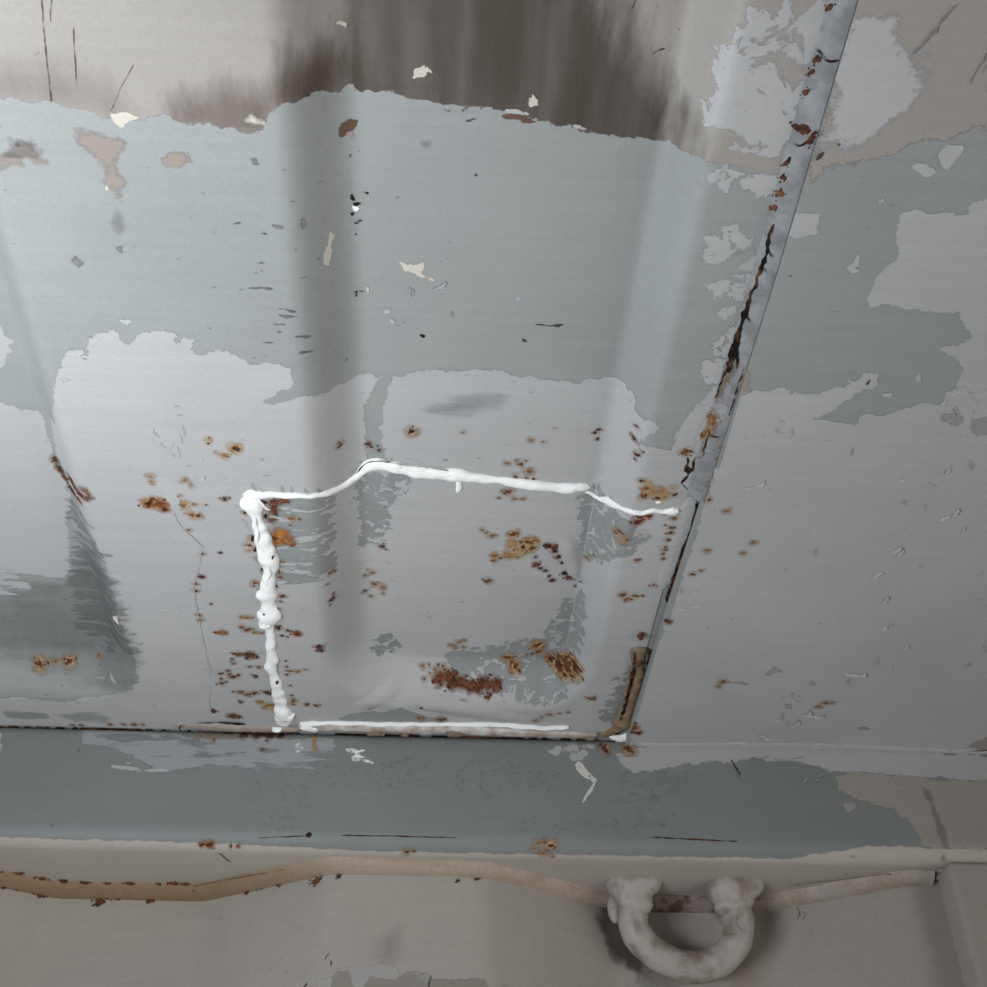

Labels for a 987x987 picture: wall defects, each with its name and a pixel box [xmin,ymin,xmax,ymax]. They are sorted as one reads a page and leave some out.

peeling [339,119,358,140]
peeling [502,94,538,123]
peeling [698,0,827,158]
rust [789,121,819,149]
peeling [817,16,932,151]
crack [715,224,774,415]
rust [51,456,91,504]
rust [137,495,207,518]
peeling [0,198,987,751]
crack [681,430,718,496]
rust [480,529,581,587]
rust [420,640,584,700]